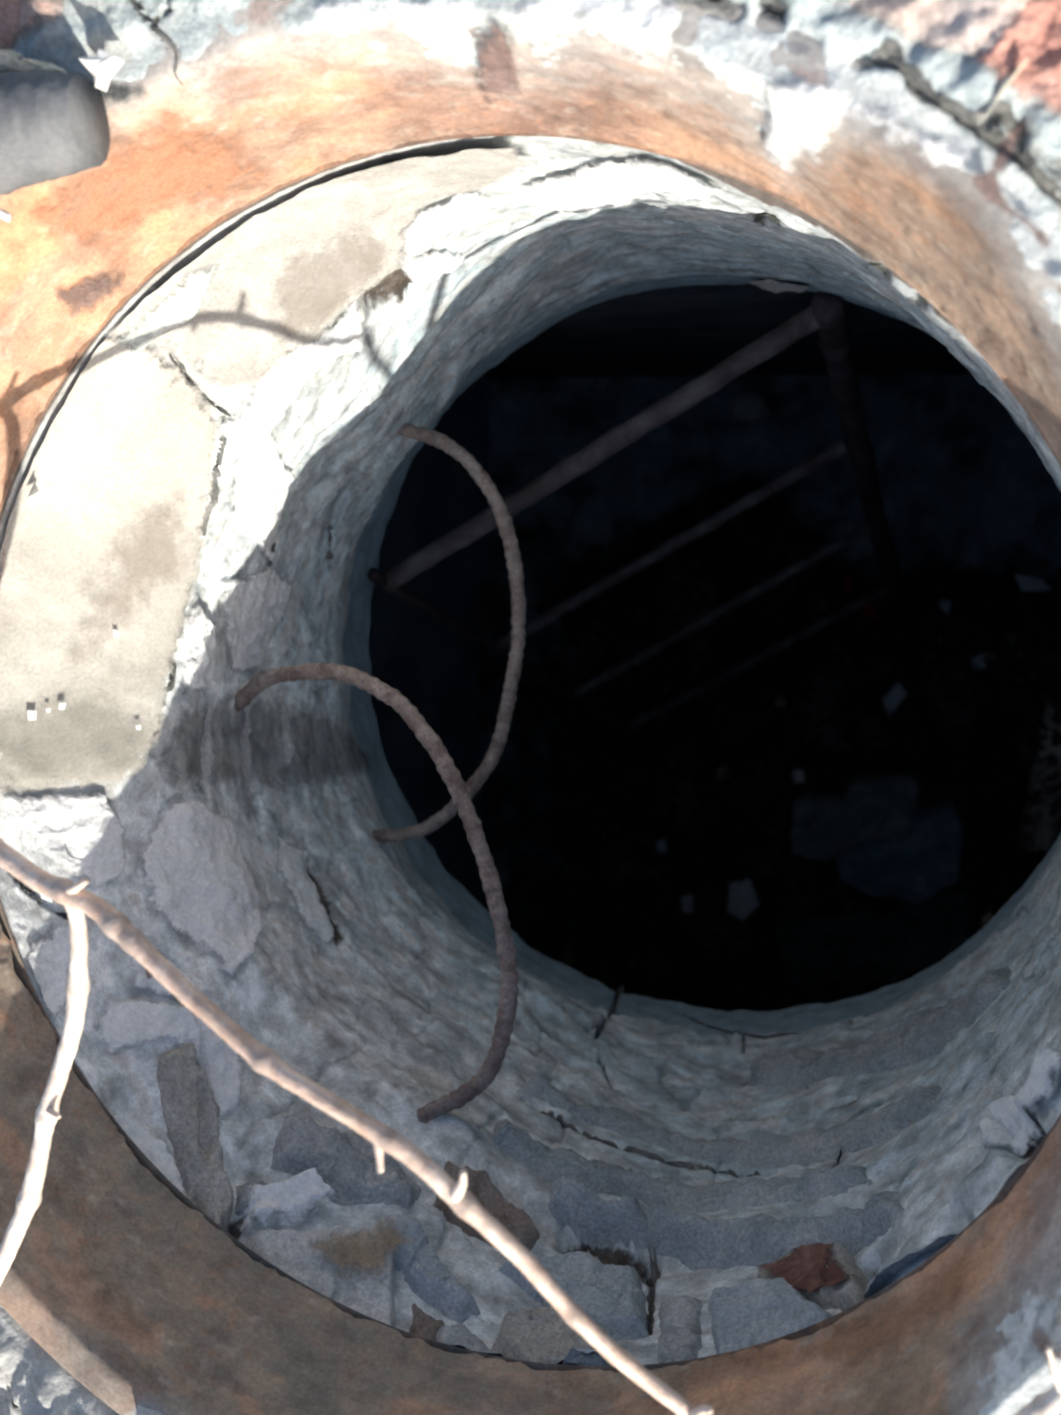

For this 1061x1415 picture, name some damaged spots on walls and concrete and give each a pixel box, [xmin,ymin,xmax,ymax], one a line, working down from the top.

spalling [759,0,788,19]
crack [129,0,183,86]
rust [478,25,523,104]
spalling [93,83,146,104]
crack [862,39,1061,205]
rust [972,118,1050,248]
spalling [750,212,780,226]
rust [57,274,122,316]
spalling [363,261,413,305]
spalling [564,1244,661,1287]
rust [758,1243,856,1292]
rust [1032,1327,1061,1360]